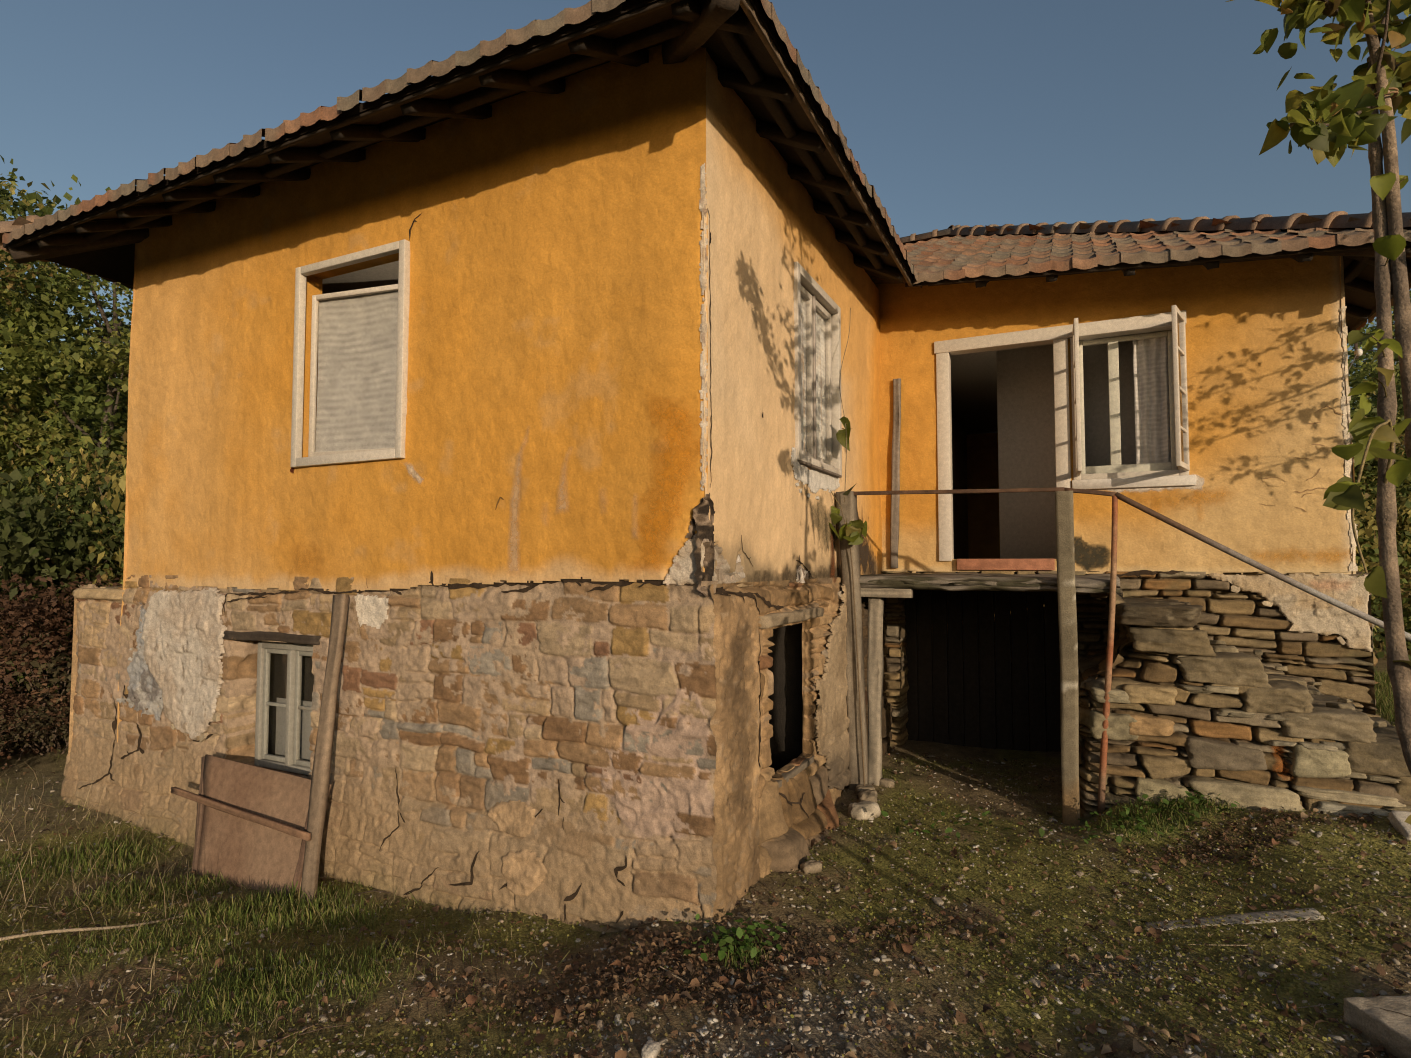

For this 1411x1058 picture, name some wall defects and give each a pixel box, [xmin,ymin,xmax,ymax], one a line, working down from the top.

spalling [663,163,745,597]
peeling [791,447,840,500]
water stain [754,482,841,588]
spalling [796,565,809,584]
water stain [857,511,876,574]
peeling [354,594,389,629]
peeling [116,588,227,742]
crack [223,535,809,818]
crack [79,685,161,789]
crack [404,852,507,895]
crack [564,883,582,920]
crack [614,857,627,923]